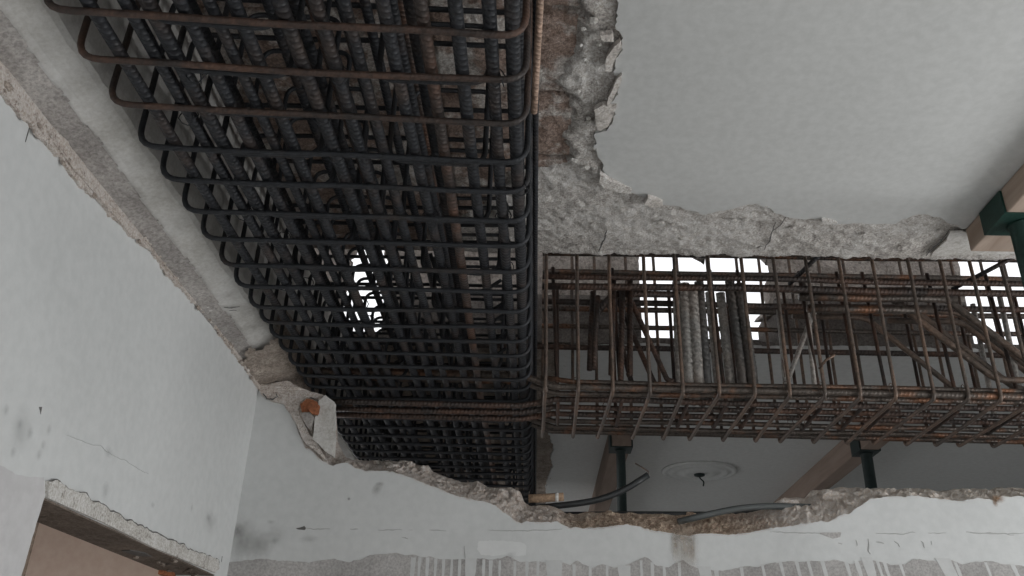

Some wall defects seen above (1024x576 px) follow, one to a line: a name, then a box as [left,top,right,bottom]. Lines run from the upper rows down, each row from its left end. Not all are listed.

spalling [0,10,334,461]
flaking render [196,0,364,249]
flaking render [323,0,433,251]
spalling [427,0,1016,261]
spalling [488,343,566,503]
peeling [37,479,1024,576]